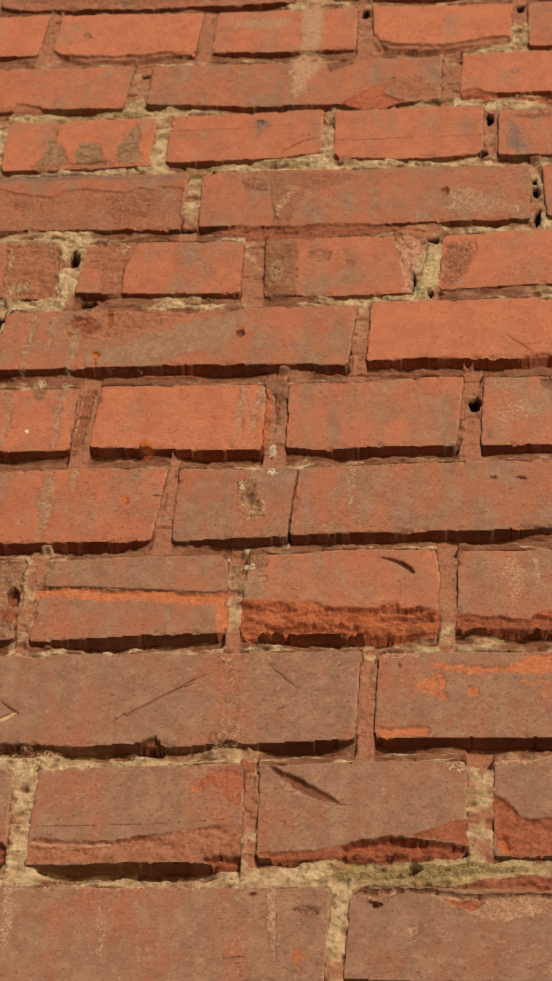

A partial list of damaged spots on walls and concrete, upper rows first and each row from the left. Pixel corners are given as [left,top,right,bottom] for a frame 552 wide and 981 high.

spalling [380,557,415,574]
spalling [0,562,25,639]
spalling [34,586,552,703]
crack [103,672,212,727]
peeling [27,824,242,874]
spalling [258,819,468,868]
spalling [492,794,552,859]